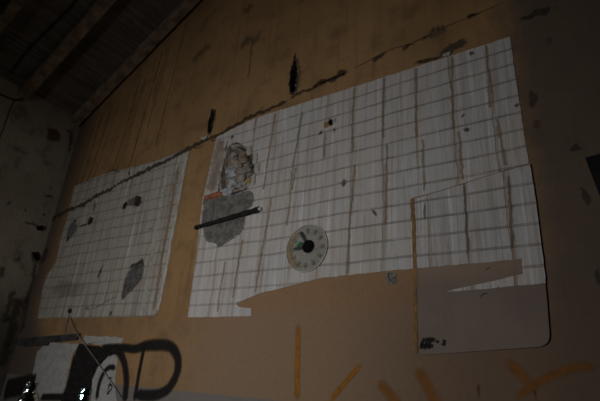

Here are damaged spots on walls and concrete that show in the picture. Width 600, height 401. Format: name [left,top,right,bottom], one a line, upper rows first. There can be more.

peeling [417,39,465,63]
spalling [122,196,141,209]
peeling [202,136,260,247]
crack [52,3,501,220]
corrosion [451,56,469,253]
peeling [121,258,144,300]
corrosion [410,198,418,354]